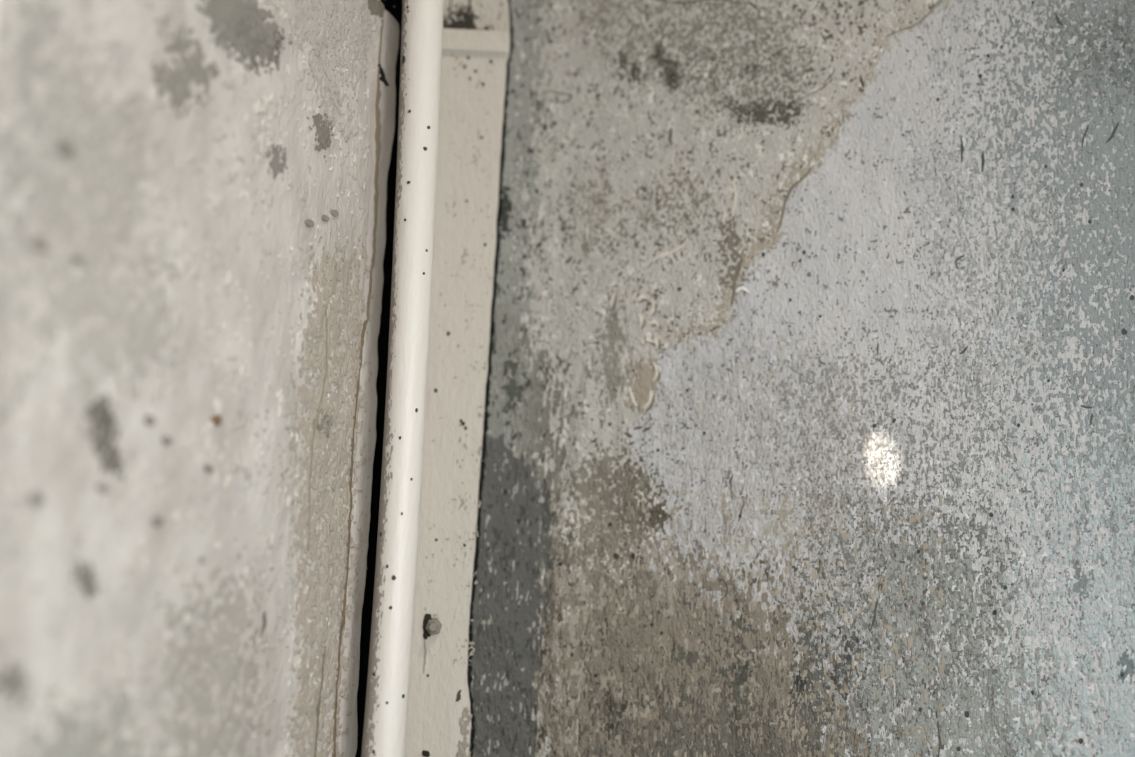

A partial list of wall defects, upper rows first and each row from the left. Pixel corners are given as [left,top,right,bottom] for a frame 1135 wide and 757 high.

peeling [505,0,948,757]
water stain [468,0,1135,757]